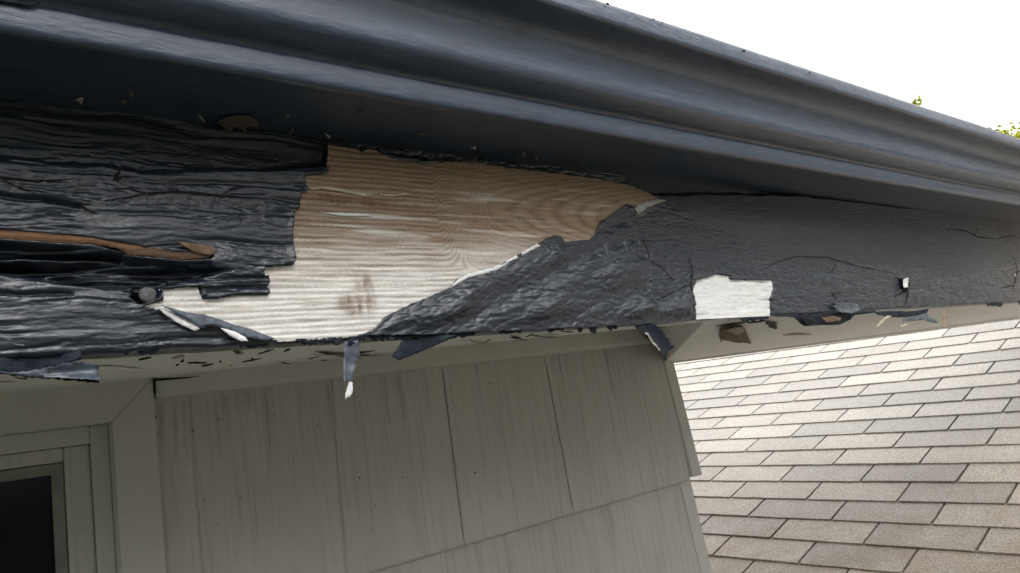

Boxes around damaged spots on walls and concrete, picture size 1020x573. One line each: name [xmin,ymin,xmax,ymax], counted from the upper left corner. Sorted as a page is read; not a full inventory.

peeling [144,132,665,400]
peeling [693,274,946,344]
crack [765,256,887,300]
crack [950,229,1020,296]
peeling [0,338,104,383]
peeling [124,342,172,361]